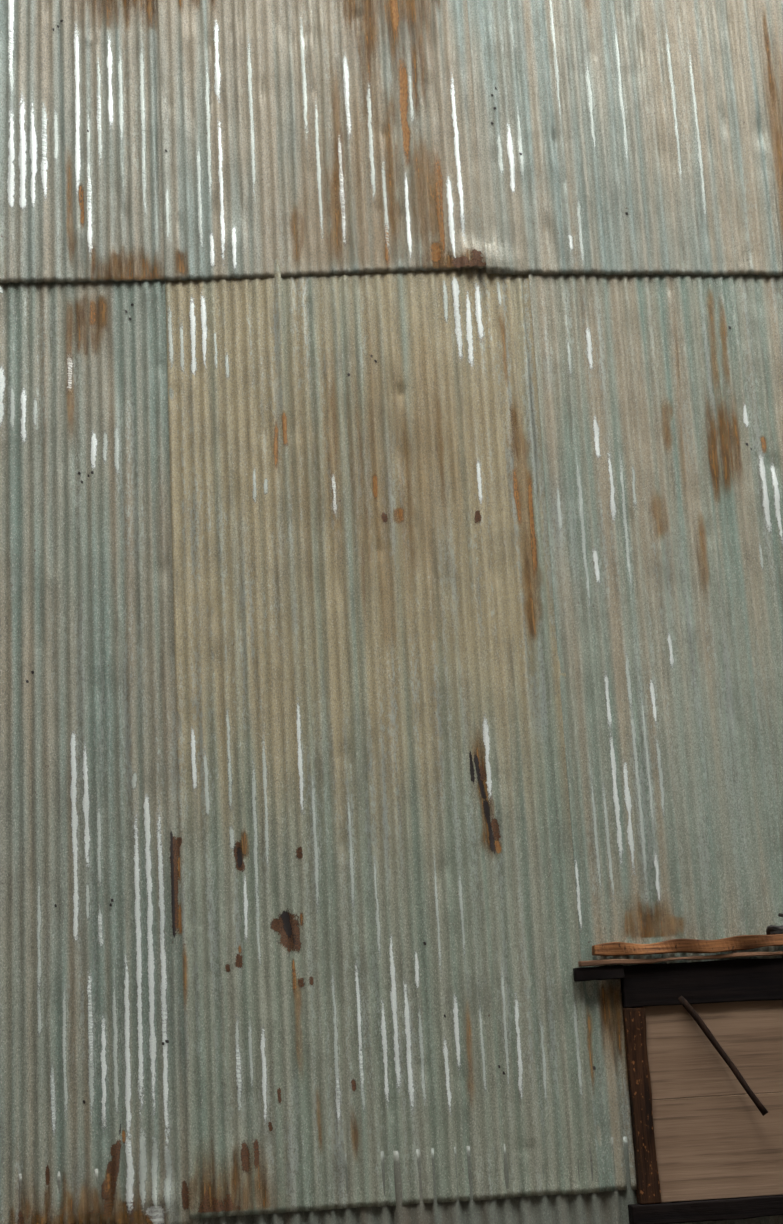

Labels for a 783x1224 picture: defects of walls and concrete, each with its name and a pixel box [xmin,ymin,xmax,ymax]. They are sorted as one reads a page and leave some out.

rust [469,751,486,784]
rust [174,837,182,882]
rust [229,826,248,867]
rust [491,818,501,853]
rust [270,911,314,1029]
rust [12,1130,153,1224]